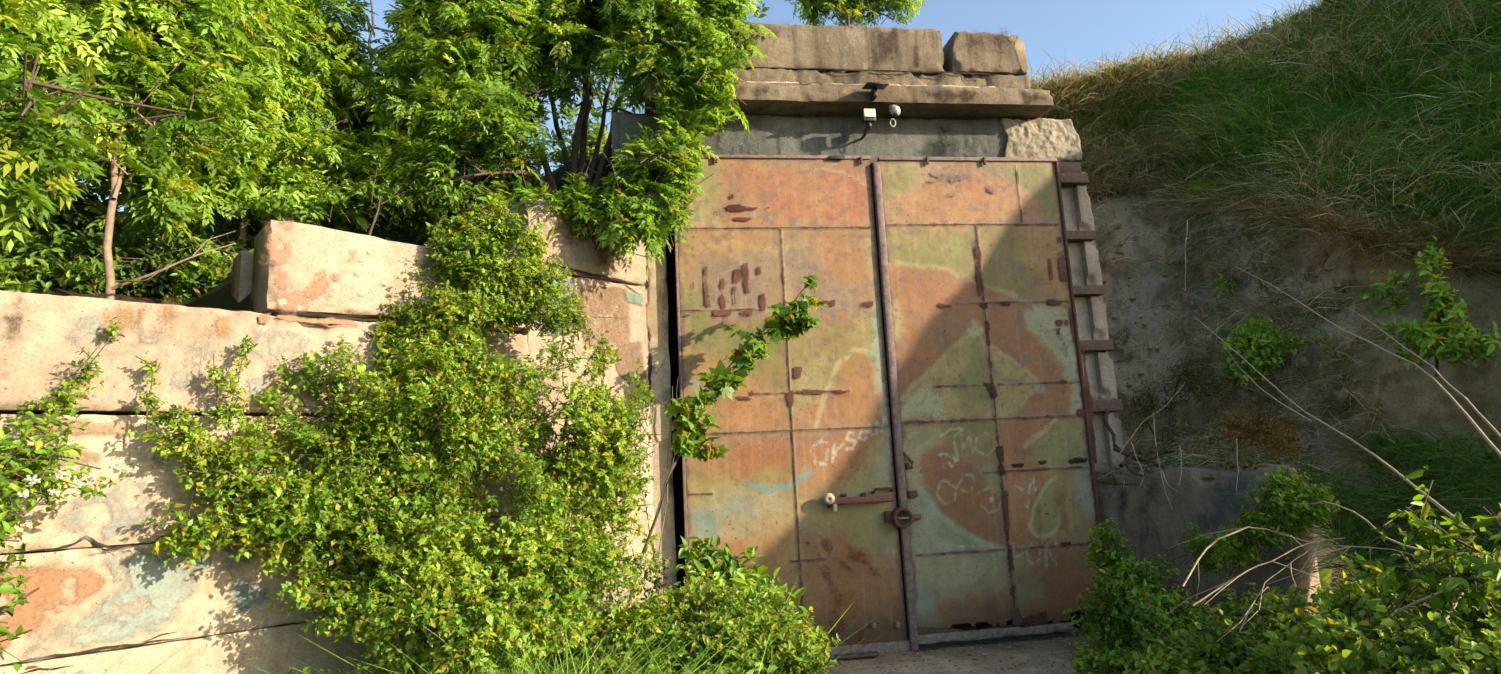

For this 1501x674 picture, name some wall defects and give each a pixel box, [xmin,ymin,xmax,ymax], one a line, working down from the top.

water stain [713,126,762,153]
rust [726,194,769,229]
rust [974,239,1010,399]
rust [737,359,846,407]
rust [917,299,1097,635]